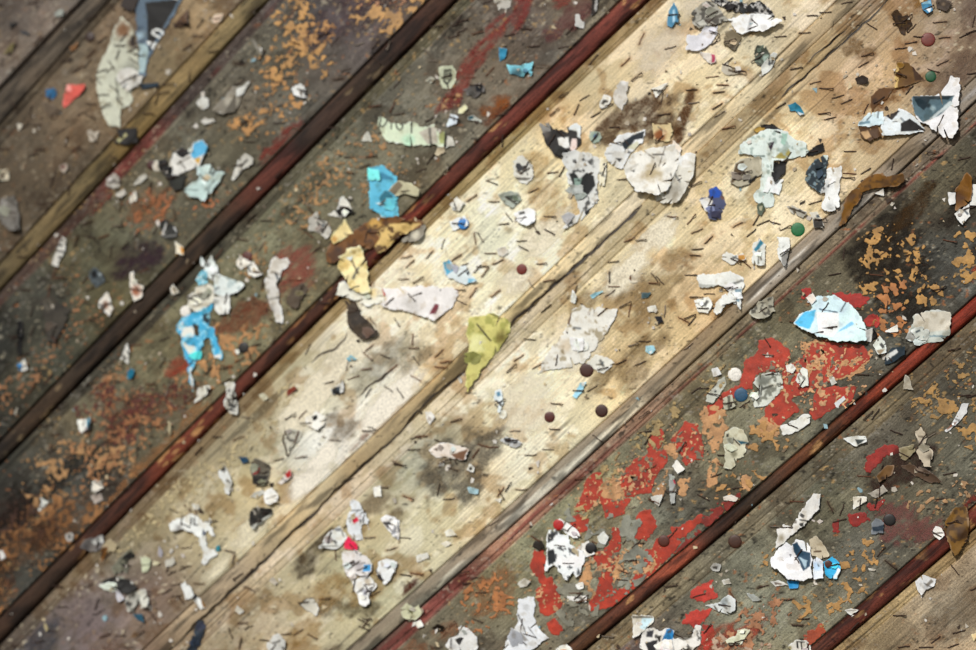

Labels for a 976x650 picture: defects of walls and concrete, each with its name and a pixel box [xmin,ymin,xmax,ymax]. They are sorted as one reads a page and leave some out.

peeling [227,0,424,150]
peeling [0,288,115,425]
peeling [0,322,270,613]
peeling [457,222,976,650]